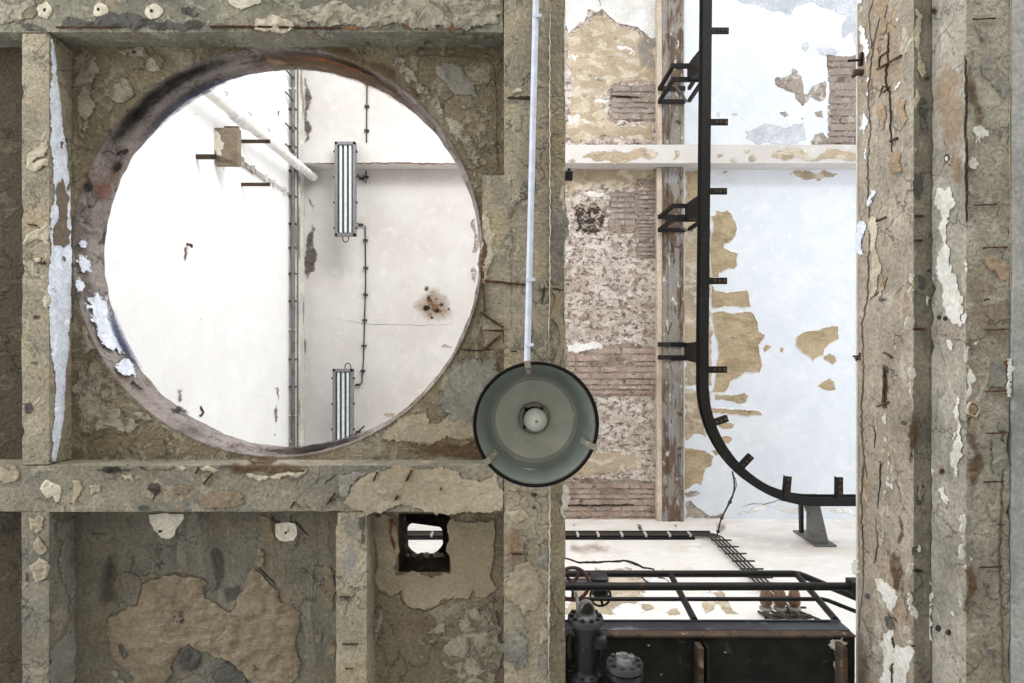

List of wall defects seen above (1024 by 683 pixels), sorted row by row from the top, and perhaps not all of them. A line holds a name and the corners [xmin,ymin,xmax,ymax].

flaking render [393,57,487,167]
flaking render [718,0,930,201]
peeling [21,0,340,461]
rust [423,287,449,319]
flaking render [542,0,658,397]
flaking render [685,210,840,490]
crack [858,0,893,627]
peeling [908,367,916,398]
peeling [904,317,926,330]
flaking render [907,187,967,327]
flaking render [107,515,301,683]
flaking render [864,545,934,683]